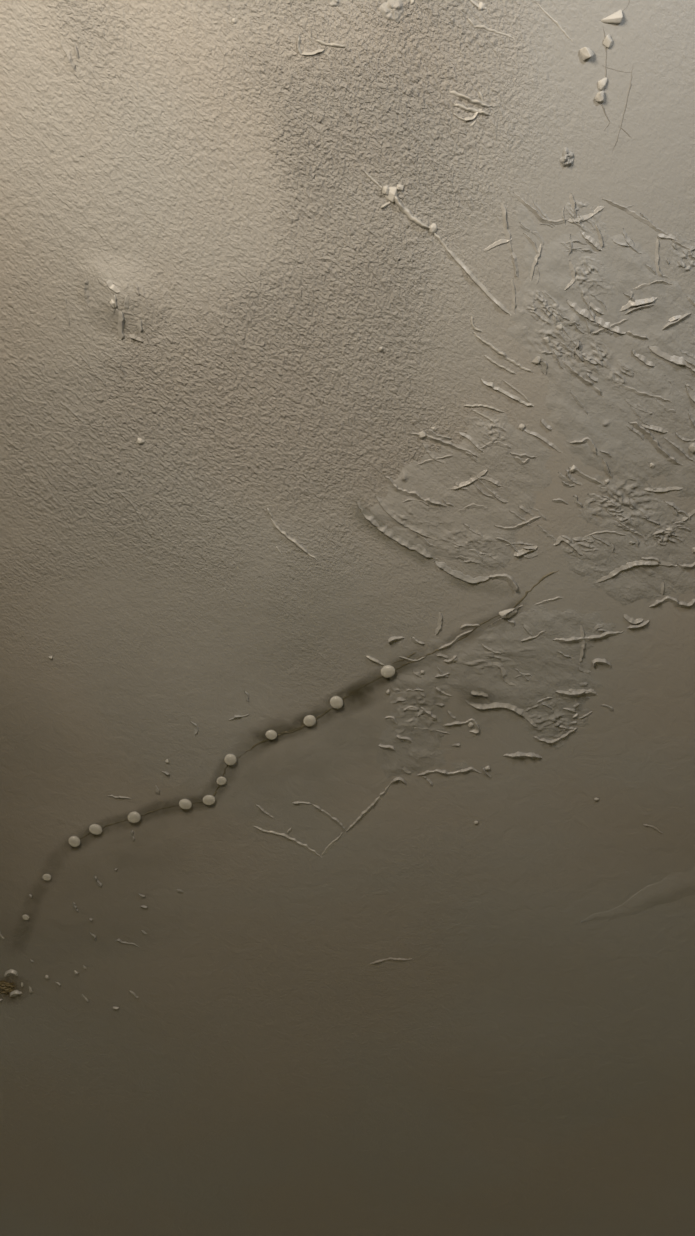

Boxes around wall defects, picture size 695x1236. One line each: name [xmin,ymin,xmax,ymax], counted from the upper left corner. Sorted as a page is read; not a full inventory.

peeling [253,192,695,857]
crack [80,570,559,839]
peeling [0,969,33,1001]